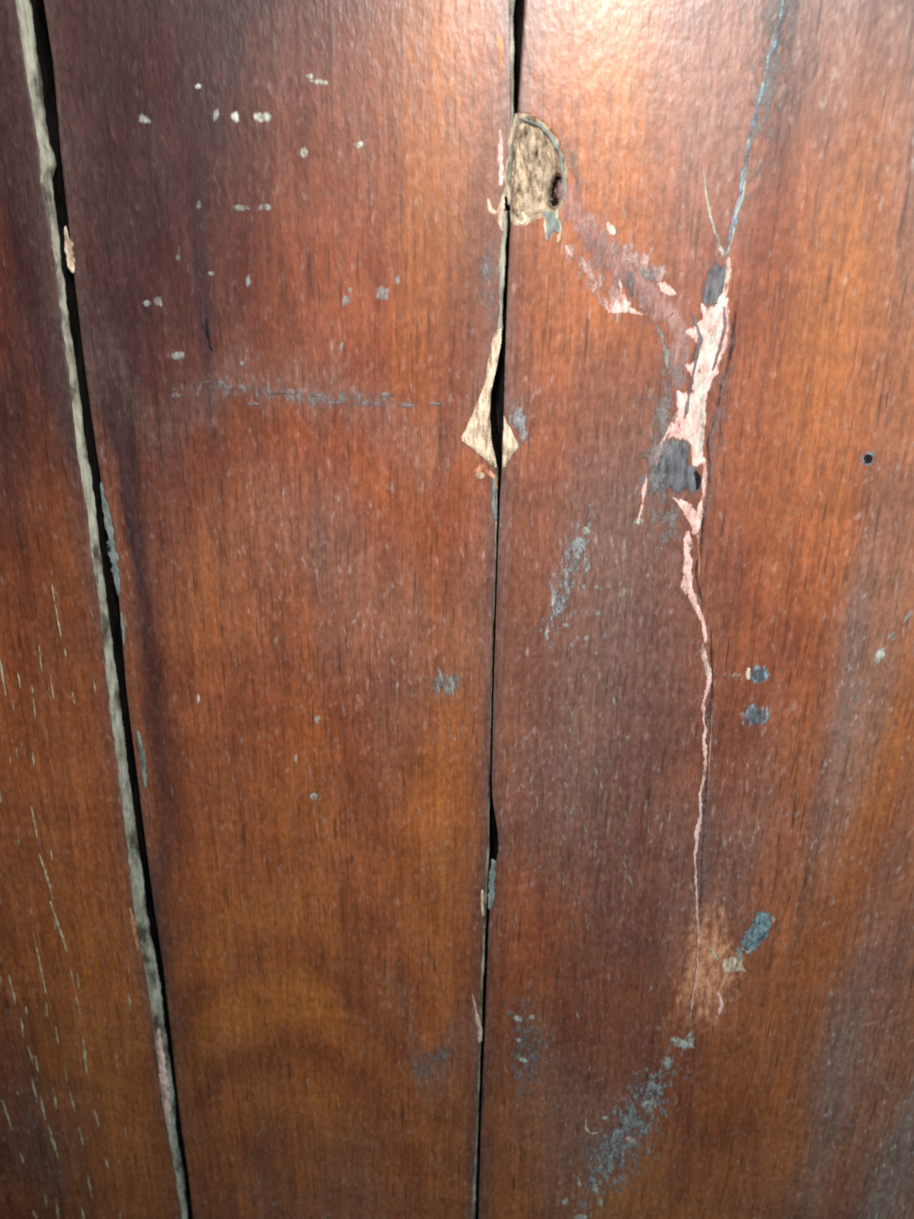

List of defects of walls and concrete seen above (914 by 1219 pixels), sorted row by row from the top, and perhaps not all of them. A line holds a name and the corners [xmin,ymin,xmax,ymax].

spalling [487,113,567,226]
crack [638,0,798,1019]